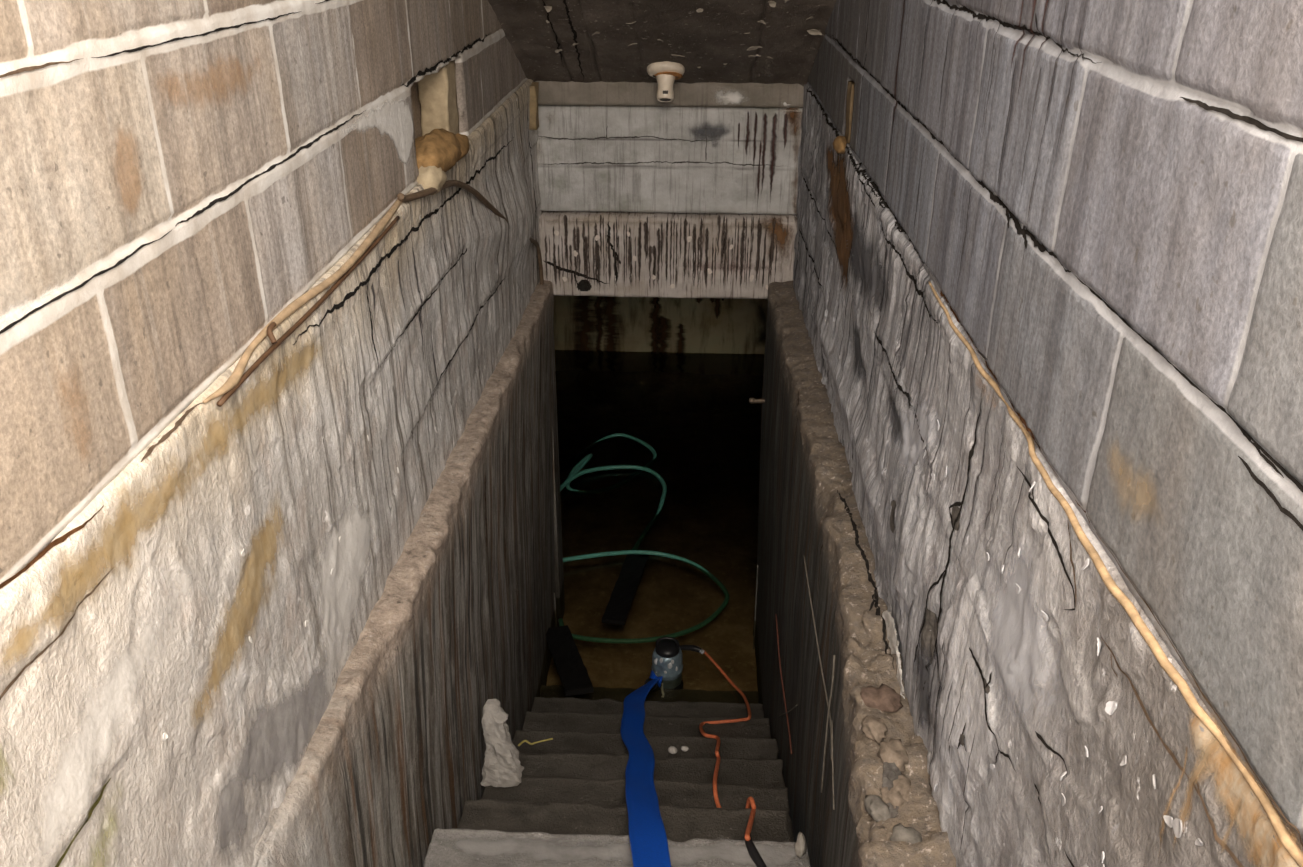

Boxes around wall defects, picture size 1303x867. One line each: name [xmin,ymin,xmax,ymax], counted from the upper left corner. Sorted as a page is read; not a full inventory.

crack [401,34,489,87]
crack [542,0,584,81]
crack [0,110,366,334]
corrosion [765,218,791,255]
corrosion [826,147,853,285]
damp [398,247,439,436]
crack [806,35,1303,867]
damp [218,463,374,850]
crack [55,778,111,867]